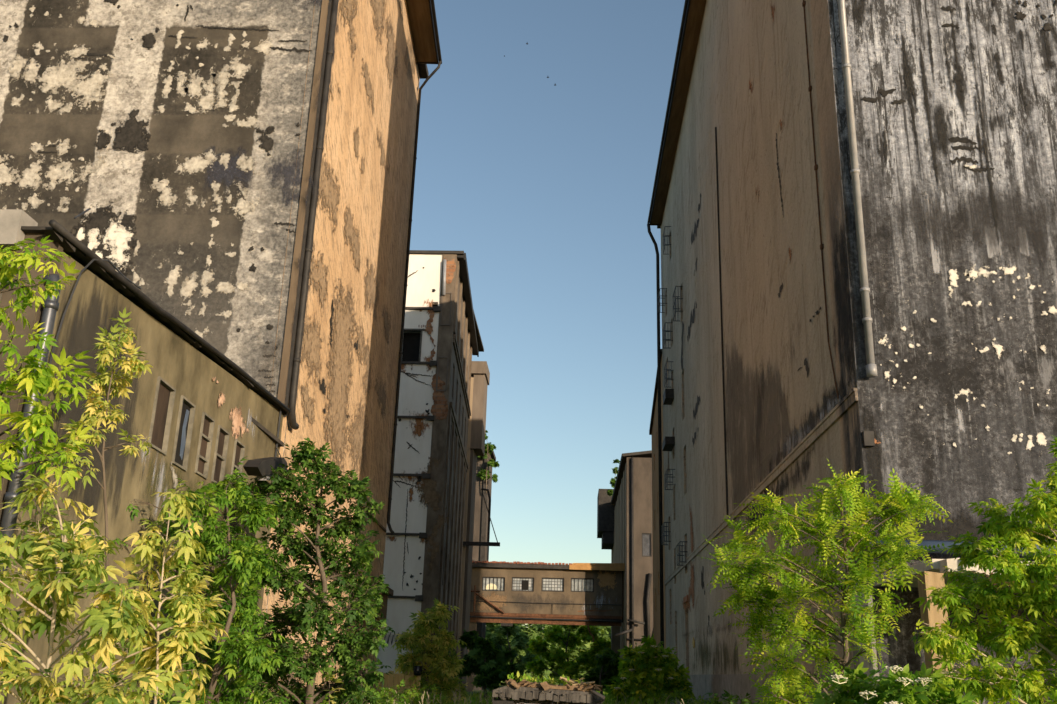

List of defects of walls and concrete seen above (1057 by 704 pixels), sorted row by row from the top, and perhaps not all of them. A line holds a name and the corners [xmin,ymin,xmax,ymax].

damp [852,0,879,23]
peeling [340,0,417,115]
peeling [353,127,365,175]
damp [868,129,888,164]
damp [891,2,1057,273]
spalling [0,27,275,338]
peeling [300,147,391,484]
peeling [948,263,1057,316]
peeling [878,326,932,388]
peeling [971,338,1004,359]
peeling [212,377,249,440]
peeling [1008,433,1047,454]